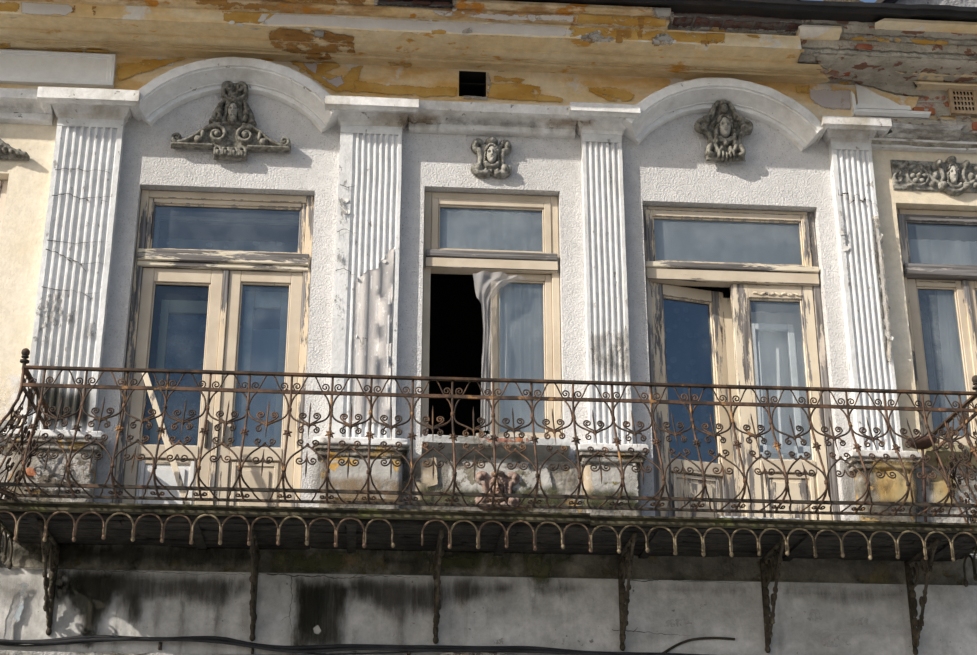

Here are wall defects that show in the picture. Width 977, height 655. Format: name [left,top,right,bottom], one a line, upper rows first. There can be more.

peeling [0,2,73,16]
peeling [117,57,185,80]
spalling [223,0,977,122]
peeling [338,198,350,220]
peeling [352,247,396,423]
water stain [54,544,251,644]
water stain [271,551,482,646]
spalling [440,638,505,655]